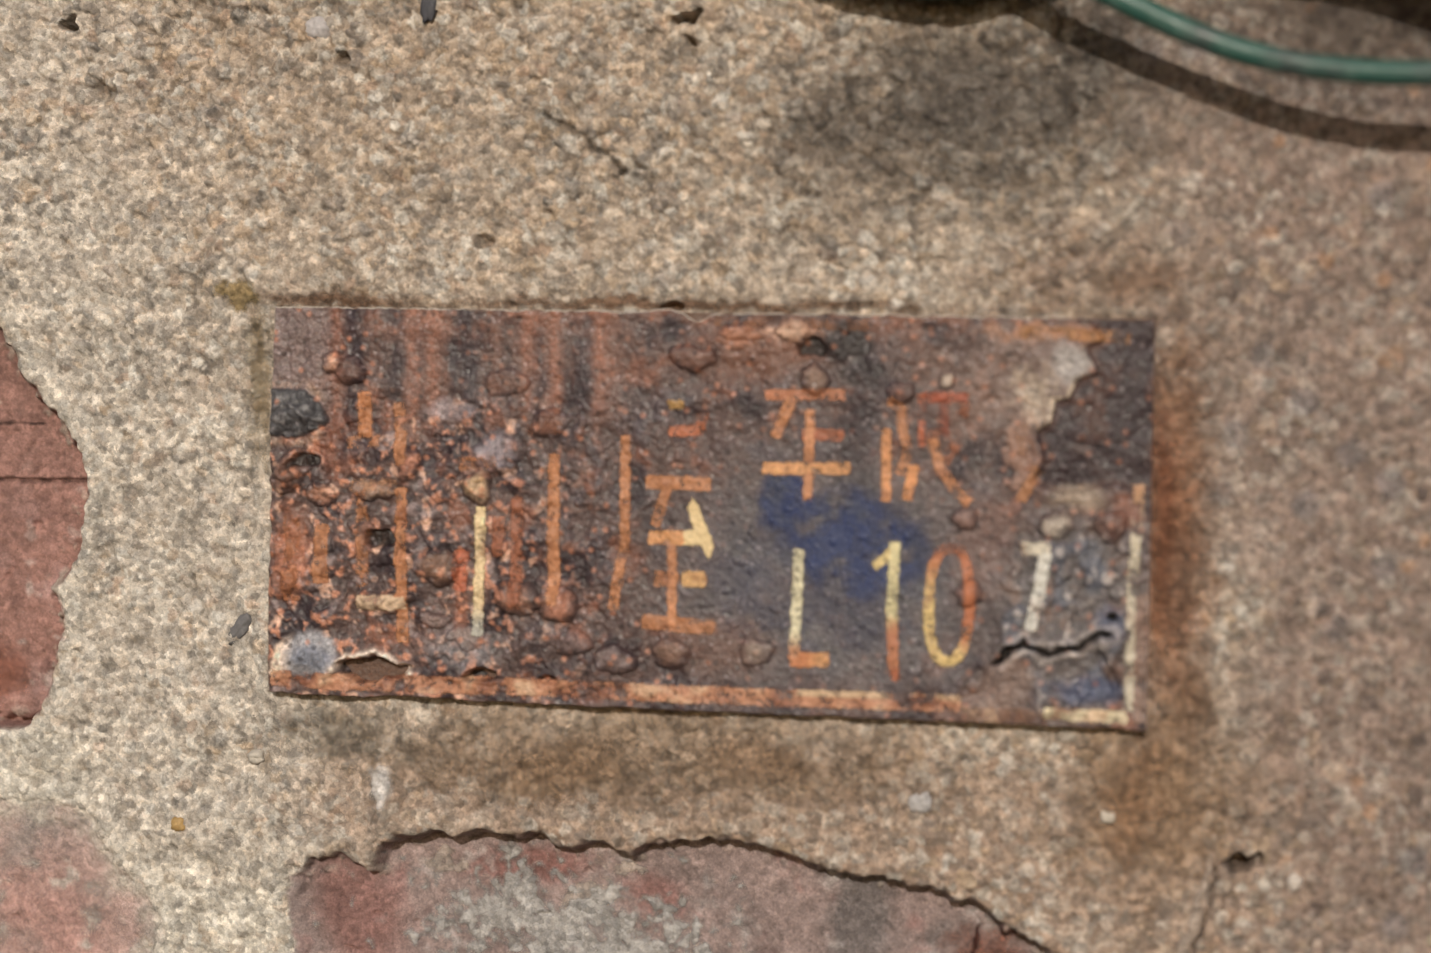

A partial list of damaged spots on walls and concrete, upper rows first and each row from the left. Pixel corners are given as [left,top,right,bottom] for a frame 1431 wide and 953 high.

rust [271,289,415,308]
rust [477,293,914,314]
flaking render [0,327,90,730]
rust [1149,392,1204,697]
flaking render [0,797,161,953]
flaking render [285,828,1058,953]
crack [1193,867,1217,948]